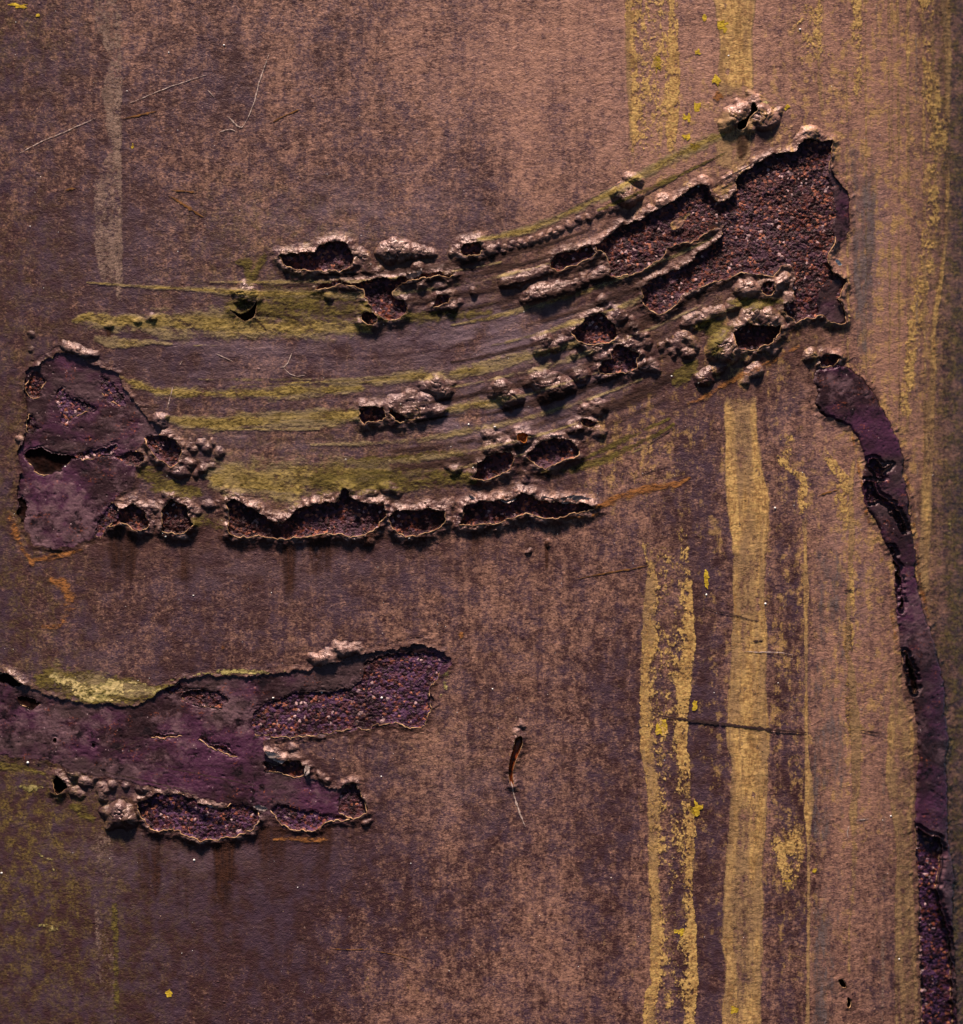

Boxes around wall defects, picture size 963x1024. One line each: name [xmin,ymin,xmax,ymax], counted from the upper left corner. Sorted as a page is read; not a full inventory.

leakage [846,0,867,164]
peeling [11,340,608,556]
leakage [72,275,628,348]
leakage [120,318,642,505]
leakage [693,297,784,356]
leakage [846,154,876,374]
leakage [876,0,953,590]
peeling [539,132,963,1024]
peeling [0,638,458,852]
leakage [639,528,699,1024]
leakage [721,398,862,1024]
leakage [881,673,919,1024]